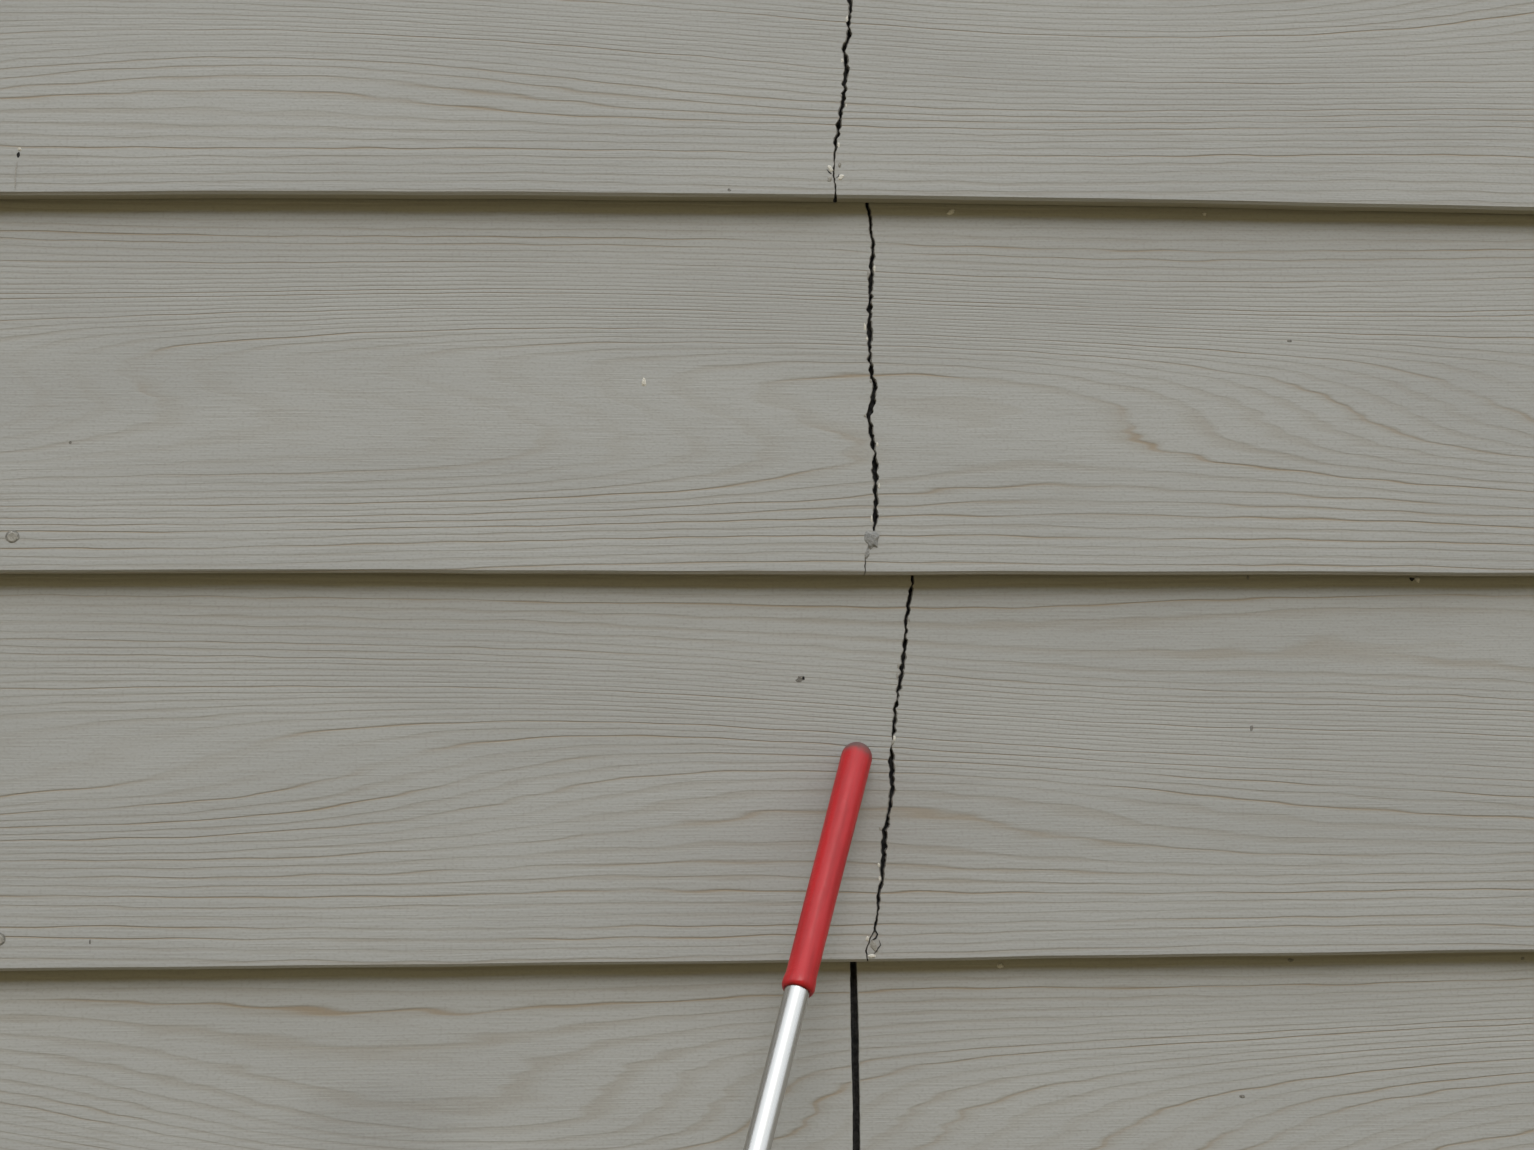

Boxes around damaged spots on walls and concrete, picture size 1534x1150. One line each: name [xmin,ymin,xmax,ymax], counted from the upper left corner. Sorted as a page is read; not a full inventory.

crack [827,0,880,567]
crack [865,576,913,961]